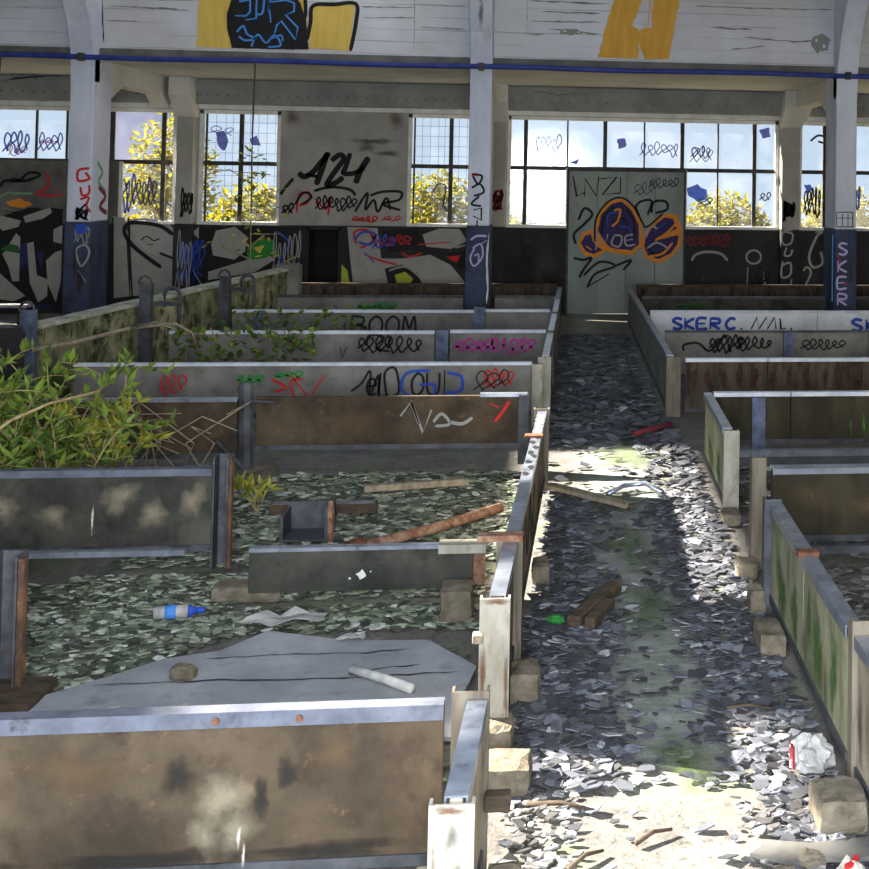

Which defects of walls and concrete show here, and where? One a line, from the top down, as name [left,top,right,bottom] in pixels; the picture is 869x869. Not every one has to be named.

peeling [811,33,830,53]